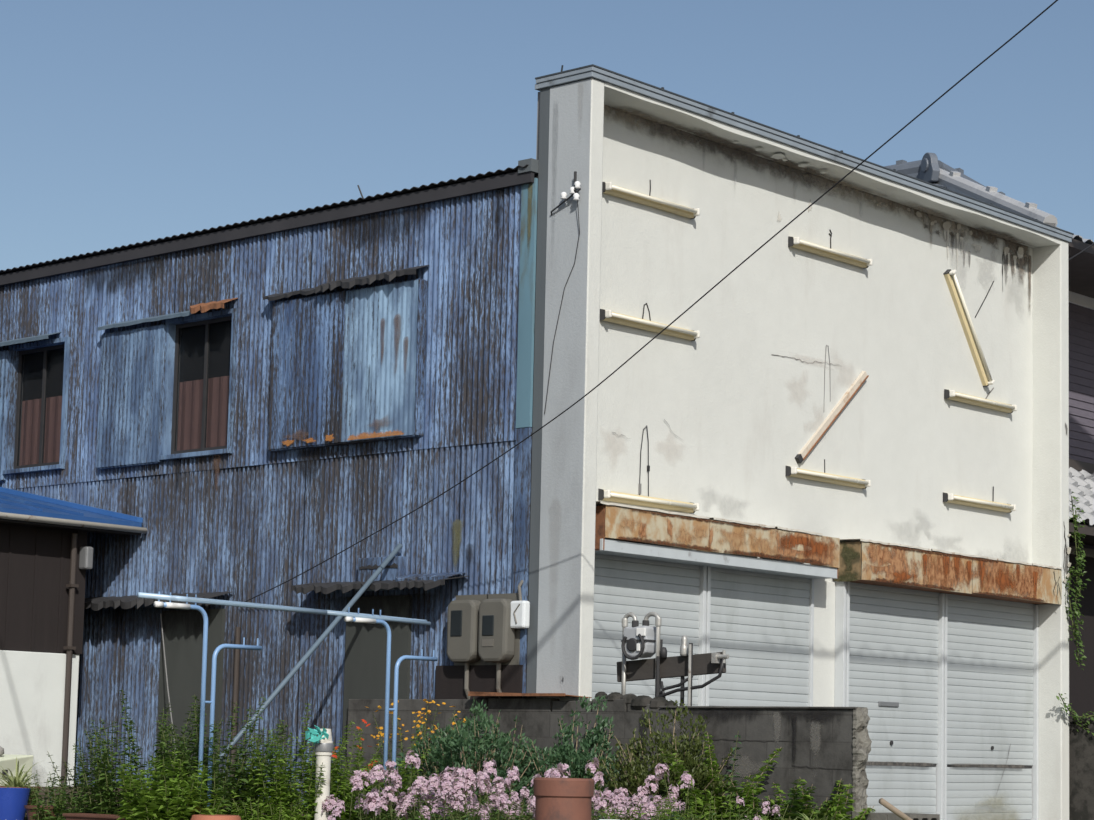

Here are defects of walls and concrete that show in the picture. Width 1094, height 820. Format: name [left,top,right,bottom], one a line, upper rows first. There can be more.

damp [604,104,1031,307]
rust [381,314,408,364]
rust [282,431,333,476]
rust [348,417,403,440]
rust [618,509,837,566]
rust [863,544,1045,602]